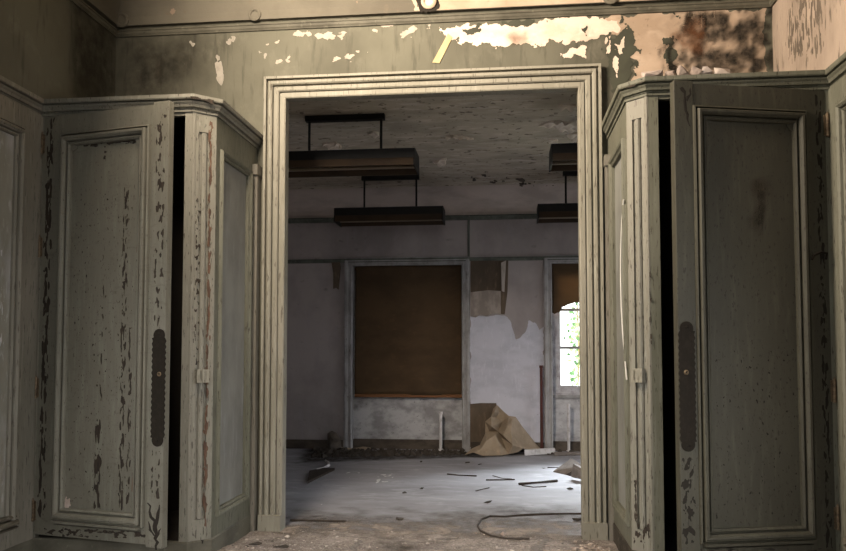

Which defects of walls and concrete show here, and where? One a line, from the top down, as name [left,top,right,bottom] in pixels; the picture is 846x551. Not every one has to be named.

flaking render [215,55,224,85]
flaking render [293,30,347,40]
flaking render [412,0,604,13]
leakage [665,7,773,74]
peeling [156,114,167,192]
peeling [154,201,164,326]
peeling [37,118,55,518]
peeling [64,187,133,510]
peeling [44,528,145,538]